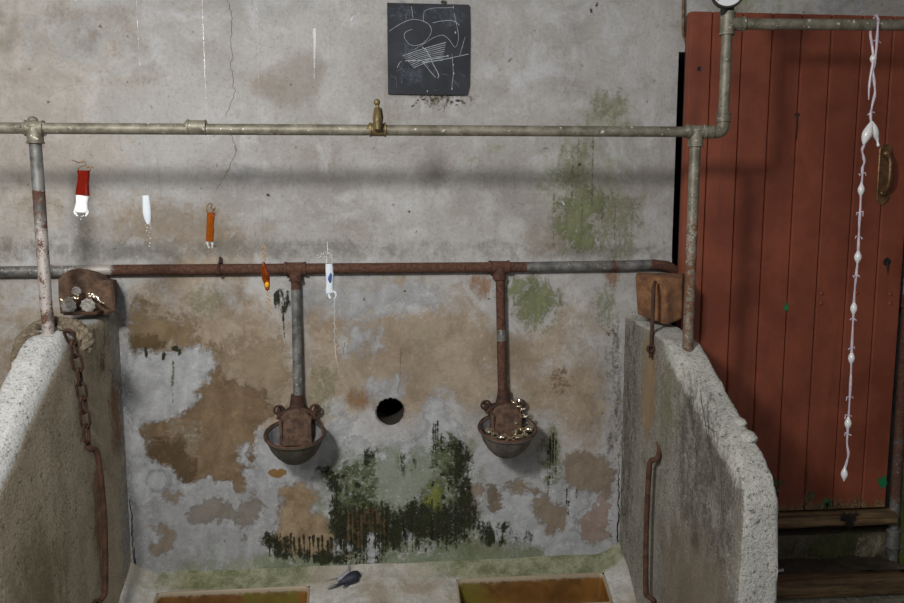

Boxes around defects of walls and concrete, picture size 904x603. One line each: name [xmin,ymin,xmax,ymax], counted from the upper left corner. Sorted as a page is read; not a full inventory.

crack [227,1,235,112]
leakage [553,140,642,258]
peeling [138,365,275,541]
leakage [127,397,467,573]